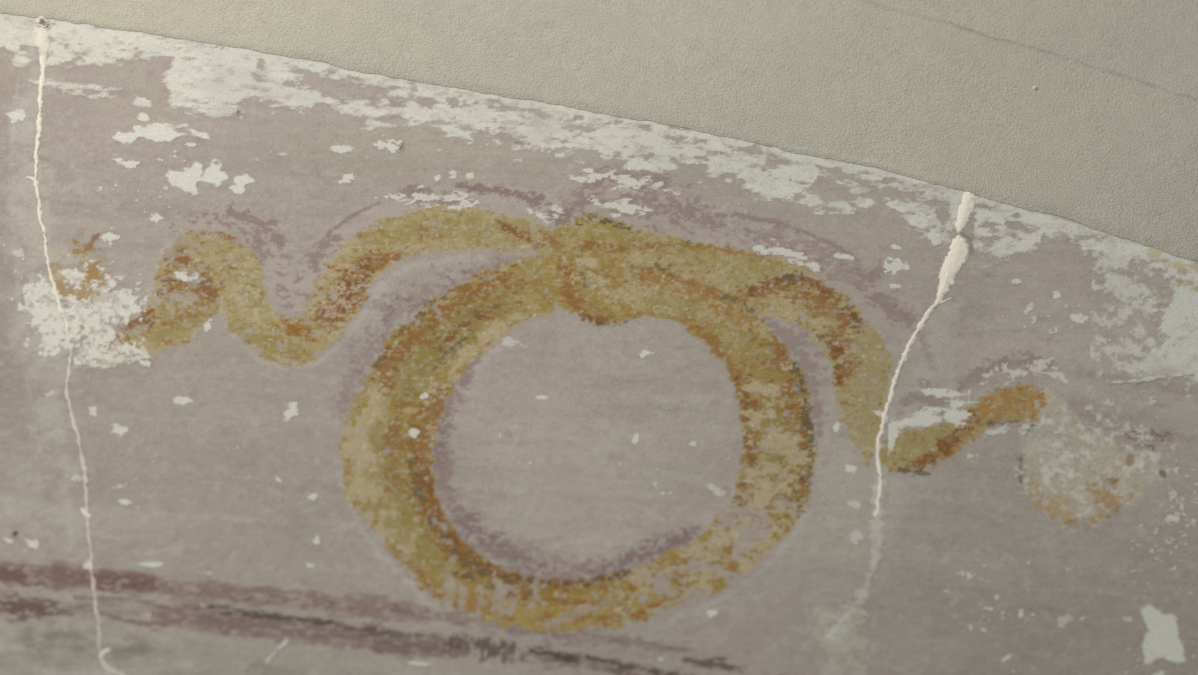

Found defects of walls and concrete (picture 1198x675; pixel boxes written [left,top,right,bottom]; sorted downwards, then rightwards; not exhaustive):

crack [26,18,127,675]
peeling [0,13,1198,524]
crack [824,191,979,641]
crack [859,0,1198,101]
peeling [1118,603,1187,675]